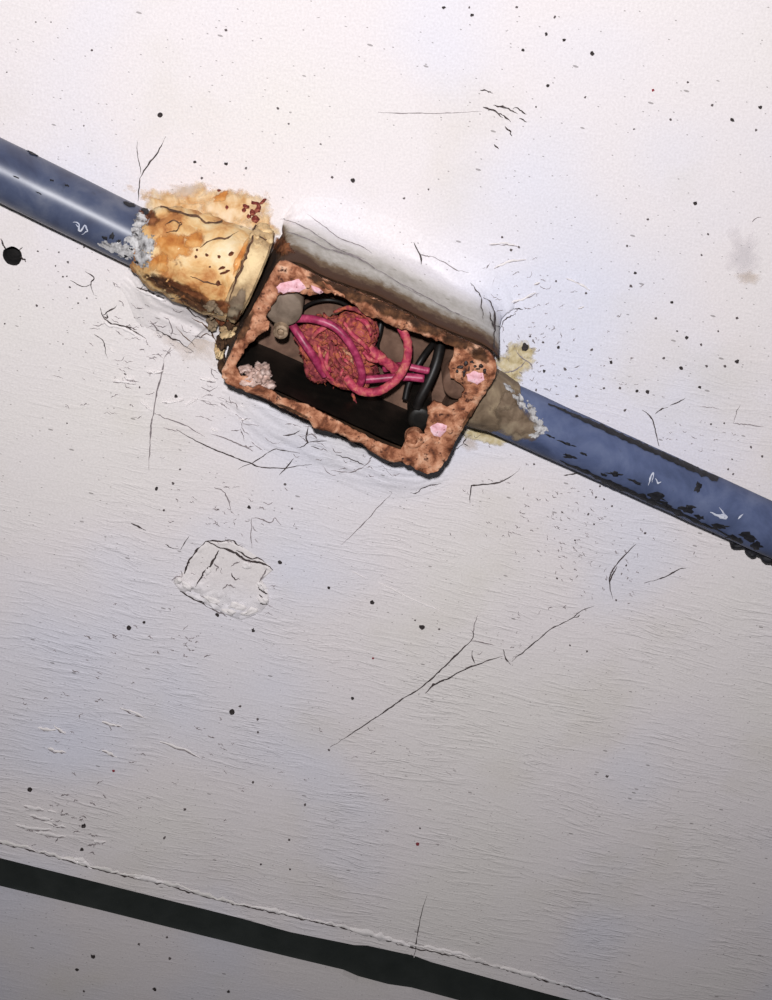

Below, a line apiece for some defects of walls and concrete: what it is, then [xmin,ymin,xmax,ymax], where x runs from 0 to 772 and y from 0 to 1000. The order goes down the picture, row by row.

crack [381,108,479,116]
crack [137,138,165,200]
corrosion [147,184,293,254]
crack [70,271,373,475]
crack [332,544,636,746]